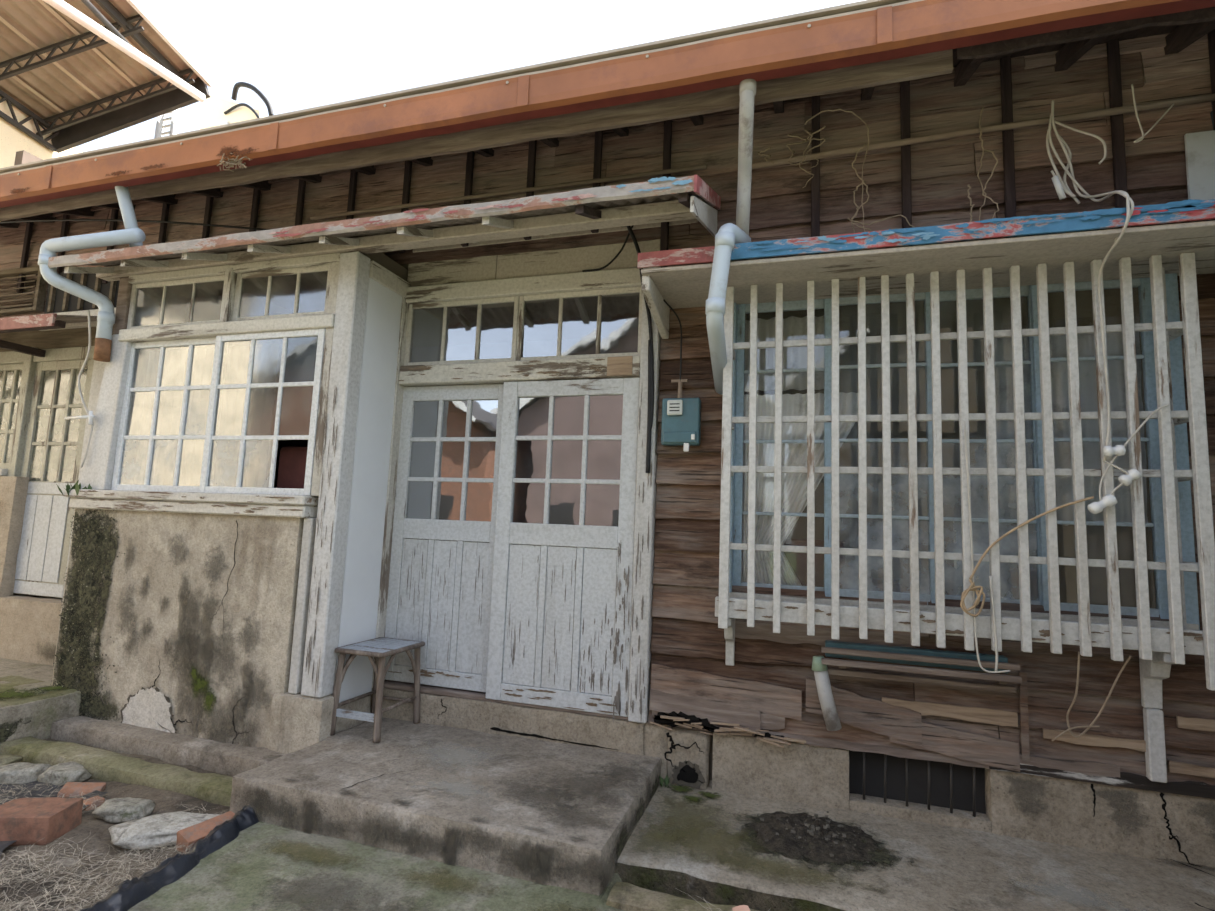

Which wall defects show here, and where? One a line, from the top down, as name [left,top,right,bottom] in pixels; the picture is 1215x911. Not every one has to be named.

rust [216,146,256,158]
peeling [616,176,692,192]
peeling [748,228,940,251]
peeling [956,199,1215,233]
leakage [44,515,150,685]
crack [213,520,238,629]
peeling [388,541,477,678]
peeling [502,517,649,721]
spalling [120,661,192,733]
leakage [162,578,269,747]
crack [664,732,703,769]
crack [1160,792,1214,876]